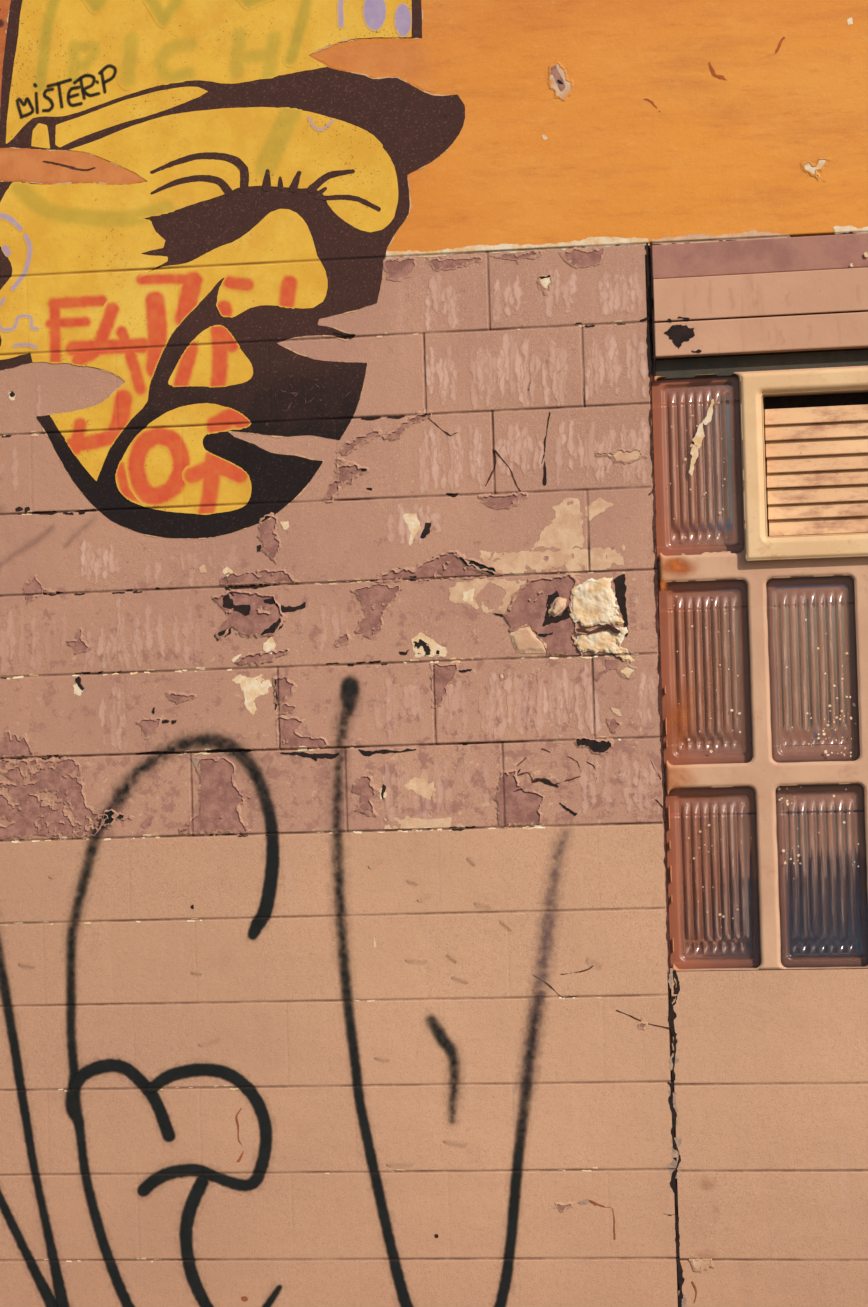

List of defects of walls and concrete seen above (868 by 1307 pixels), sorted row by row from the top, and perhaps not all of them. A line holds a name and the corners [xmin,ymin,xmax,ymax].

peeling [664,316,701,353]
peeling [22,574,56,605]
peeling [199,512,505,751]
flaking render [493,570,639,681]
flaking render [72,673,84,696]
peeling [136,689,197,740]
peeling [574,707,623,758]
peeling [0,730,160,843]
peeling [178,748,251,836]
peeling [351,774,466,833]
peeling [488,769,577,830]
crack [575,243,697,1307]